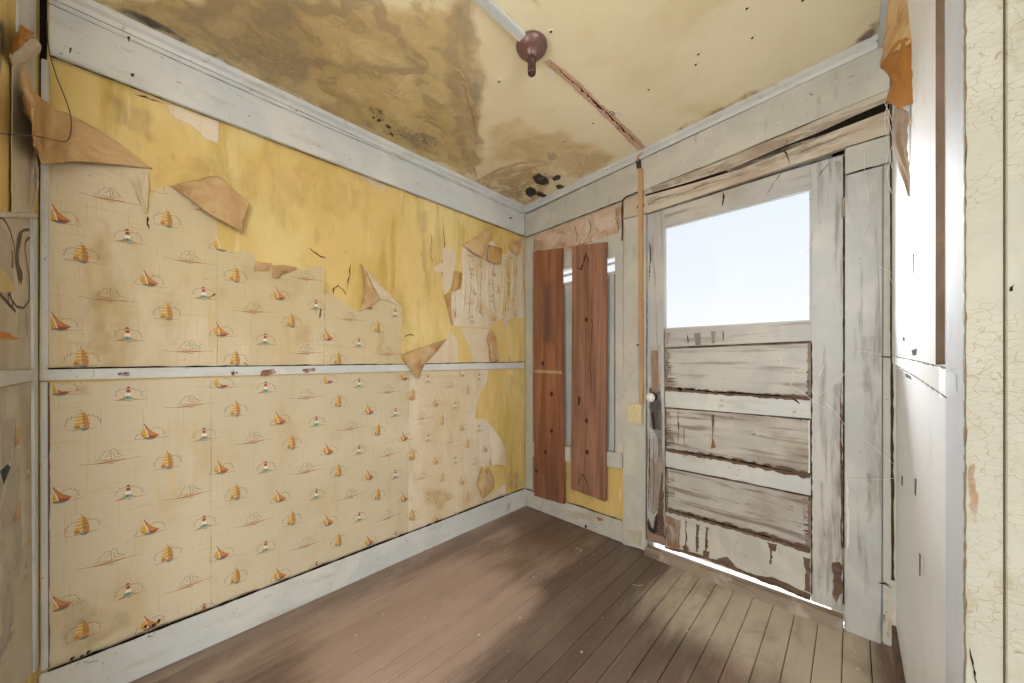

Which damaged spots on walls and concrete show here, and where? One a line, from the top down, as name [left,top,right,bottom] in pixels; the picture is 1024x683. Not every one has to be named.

peeling [9,25,152,214]
crack [44,1,890,259]
water stain [476,156,564,203]
flaking render [488,202,623,264]
peeling [254,262,297,278]
peeling [359,264,401,311]
peeling [444,271,462,325]
peeling [487,330,499,362]
peeling [964,0,978,683]
peeling [477,424,507,498]